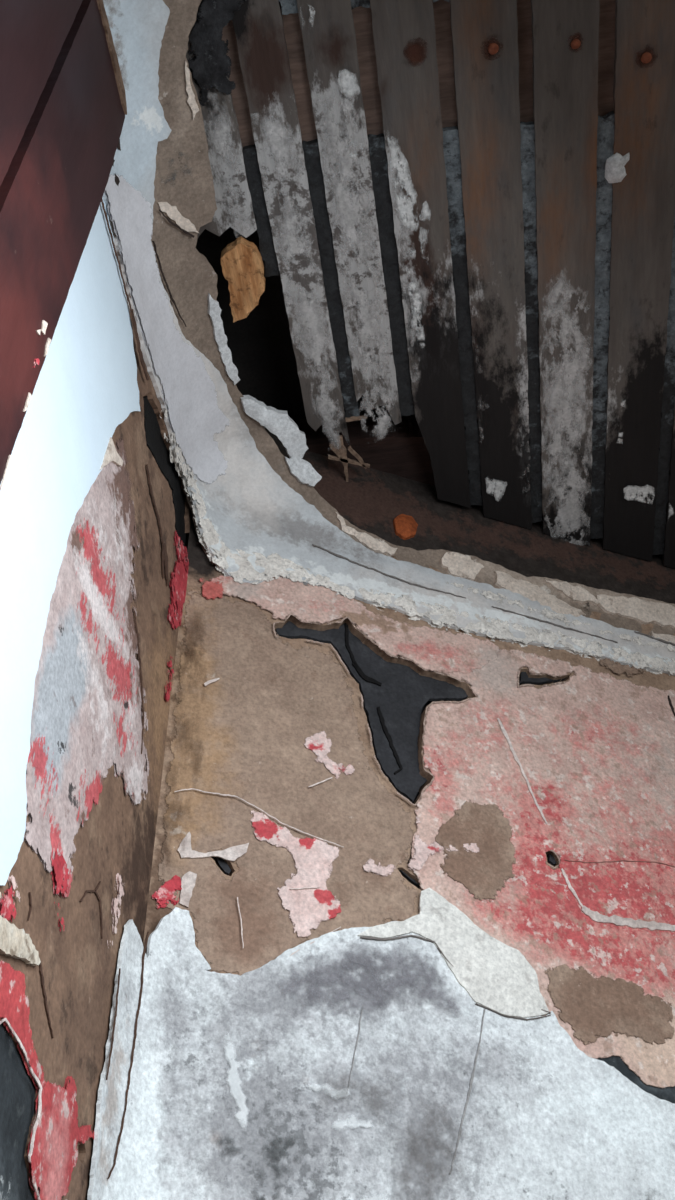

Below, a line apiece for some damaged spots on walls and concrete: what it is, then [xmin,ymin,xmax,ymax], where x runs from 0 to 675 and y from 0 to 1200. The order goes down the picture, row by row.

peeling [157,202,199,233]
efflorescence [325,71,390,436]
efflorescence [388,139,430,257]
efflorescence [486,478,506,500]
efflorescence [545,280,588,544]
efflorescence [624,485,654,502]
peeling [24,437,150,932]
peeling [143,396,675,1045]
peeling [0,875,94,1200]
crack [347,1004,364,1091]
crack [449,1009,485,1174]
flaking render [598,1055,675,1104]